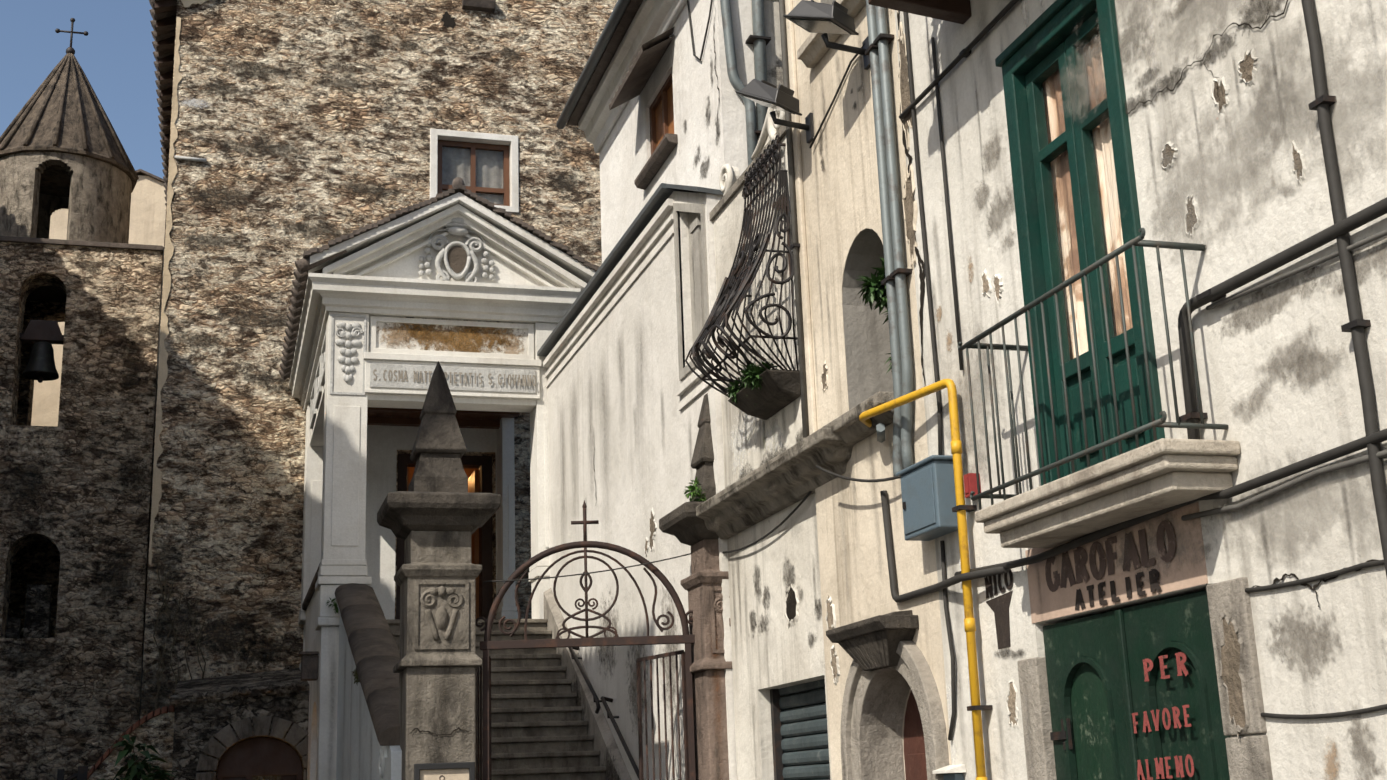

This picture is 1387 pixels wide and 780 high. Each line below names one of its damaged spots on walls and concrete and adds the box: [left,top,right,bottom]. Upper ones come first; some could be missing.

crack [1106,0,1288,126]
damp [1125,0,1280,113]
spalling [1210,47,1258,113]
spalling [1161,141,1178,173]
spalling [1291,140,1306,186]
spalling [1184,194,1201,240]
damp [1223,266,1316,329]
damp [1234,327,1337,416]
spalling [785,580,800,629]
peeling [825,595,840,685]
damp [1271,616,1338,674]
damp [1325,715,1379,780]